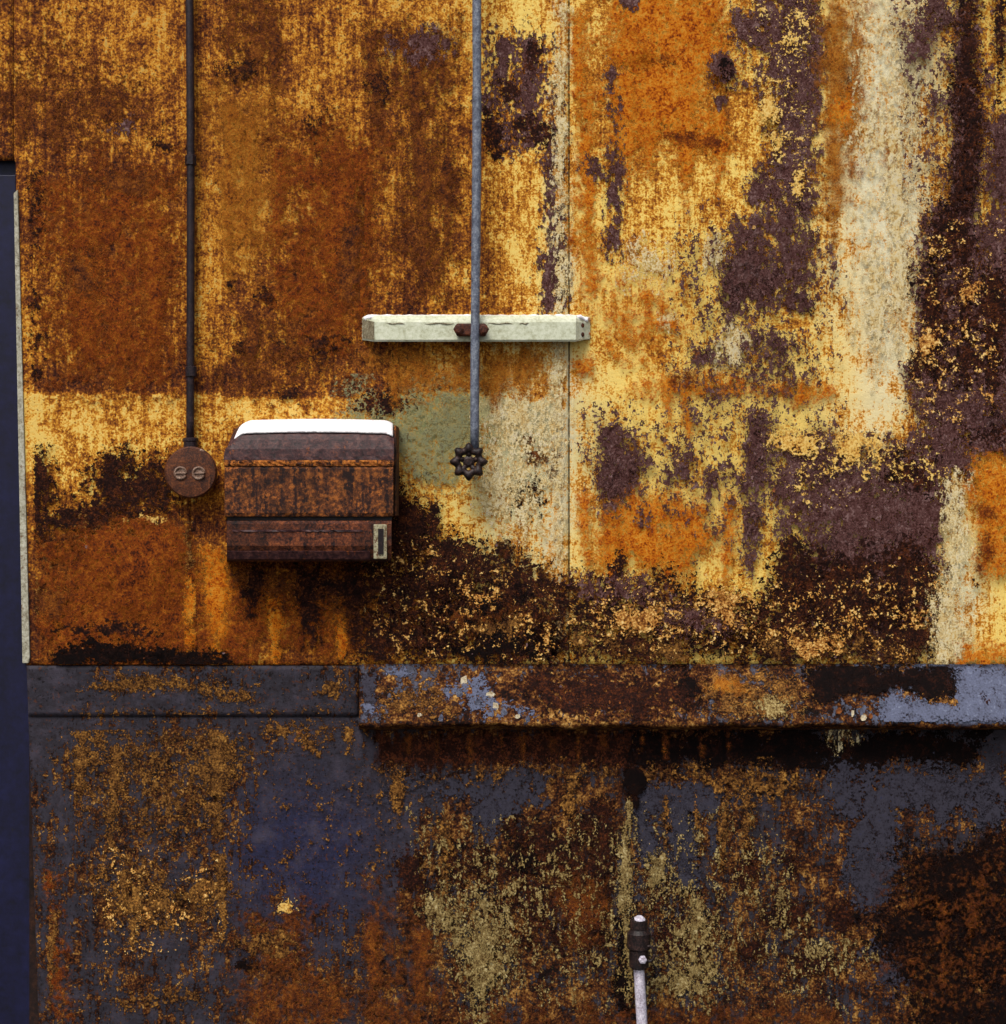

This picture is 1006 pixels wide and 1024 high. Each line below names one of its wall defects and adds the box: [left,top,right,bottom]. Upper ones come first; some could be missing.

corrosion [0,0,549,418]
corrosion [562,0,837,439]
corrosion [943,0,1006,214]
corrosion [32,433,1006,1024]